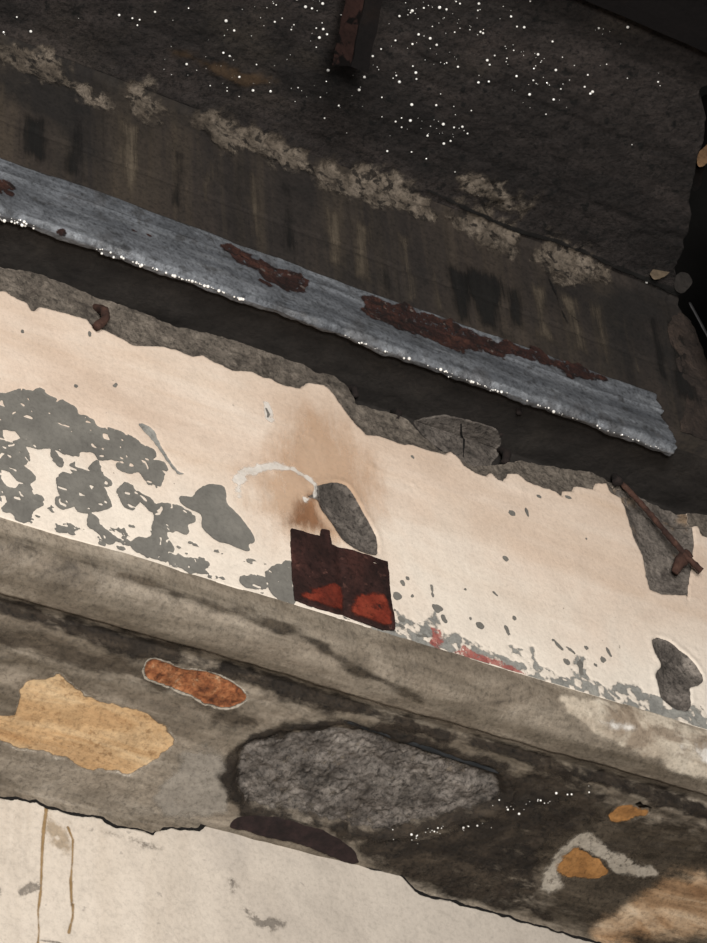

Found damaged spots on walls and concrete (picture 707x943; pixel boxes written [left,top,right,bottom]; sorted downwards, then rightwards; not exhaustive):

corrosion [0,179,16,196]
corrosion [220,243,310,293]
corrosion [361,295,608,381]
spalling [0,267,707,604]
flaking render [0,672,176,776]
damp [154,752,228,816]
damp [0,597,456,745]
crack [0,796,602,943]
spalling [218,719,516,843]
damp [358,735,707,928]
peeling [371,576,707,729]
damp [560,695,707,779]